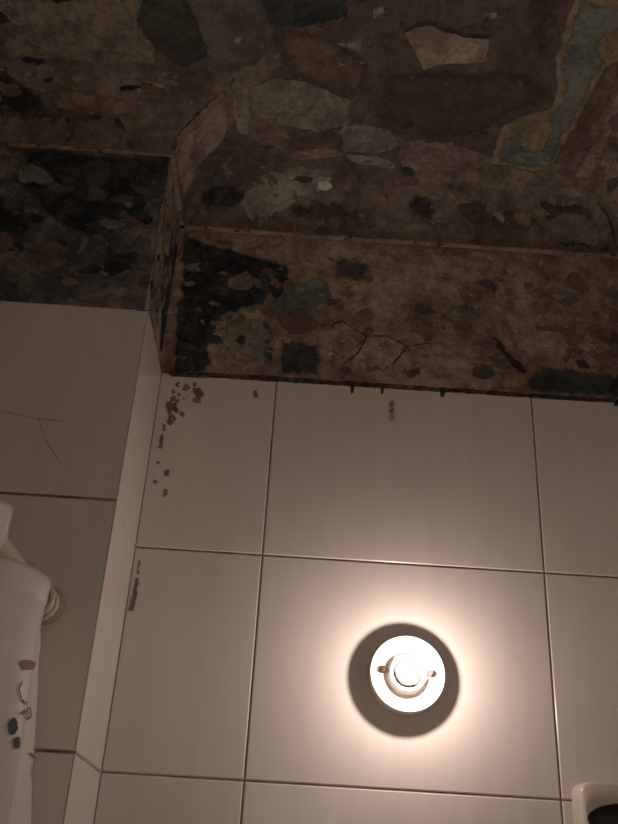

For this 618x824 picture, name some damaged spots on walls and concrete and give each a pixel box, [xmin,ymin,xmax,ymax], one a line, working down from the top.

peeling [0,0,155,123]
peeling [166,0,463,230]
peeling [404,25,490,70]
peeling [491,0,618,173]
leakage [26,150,157,236]
leakage [329,258,369,281]
leakage [160,234,289,372]
leakage [279,340,321,374]
leakage [528,359,618,399]
leakage [158,382,204,448]
leakage [129,561,140,611]